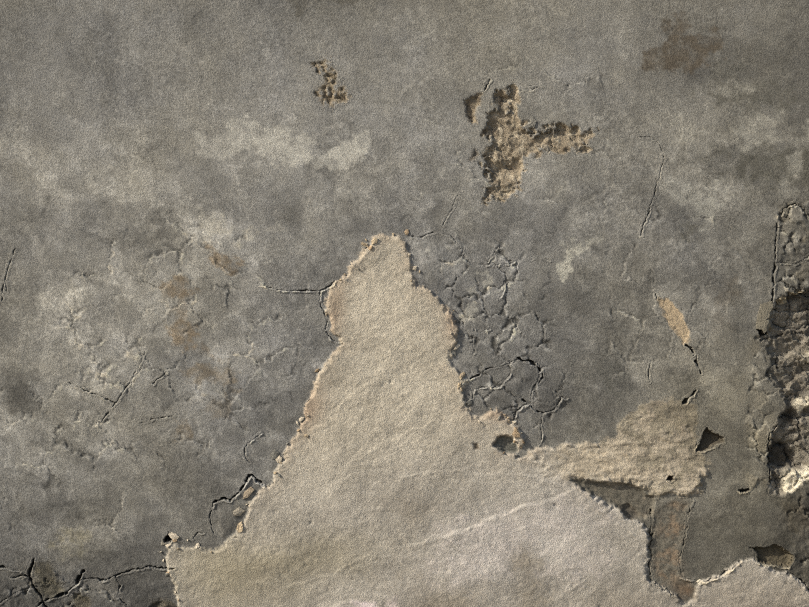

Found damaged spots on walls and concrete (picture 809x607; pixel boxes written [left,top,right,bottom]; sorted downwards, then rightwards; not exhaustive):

spalling [25,552,94,607]
crack [0,200,343,607]
spalling [307,53,354,113]
peeling [147,229,809,607]
spalling [463,80,601,207]
crack [371,33,809,448]